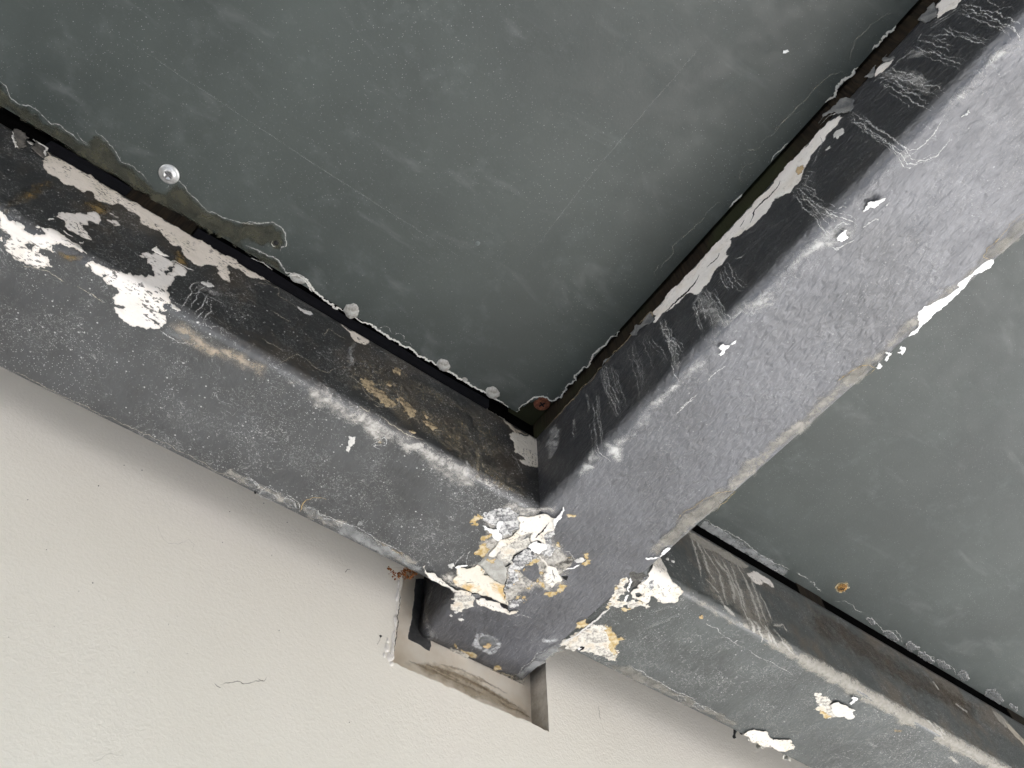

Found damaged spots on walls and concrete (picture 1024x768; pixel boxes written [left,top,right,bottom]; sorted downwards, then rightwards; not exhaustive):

peeling [0,129,268,344]
peeling [629,97,855,337]
crack [741,182,780,225]
crack [665,255,719,312]
peeling [876,259,994,369]
peeling [487,409,538,471]
peeling [423,507,585,621]
peeling [624,547,683,604]
peeling [814,693,858,720]
peeling [732,729,795,761]